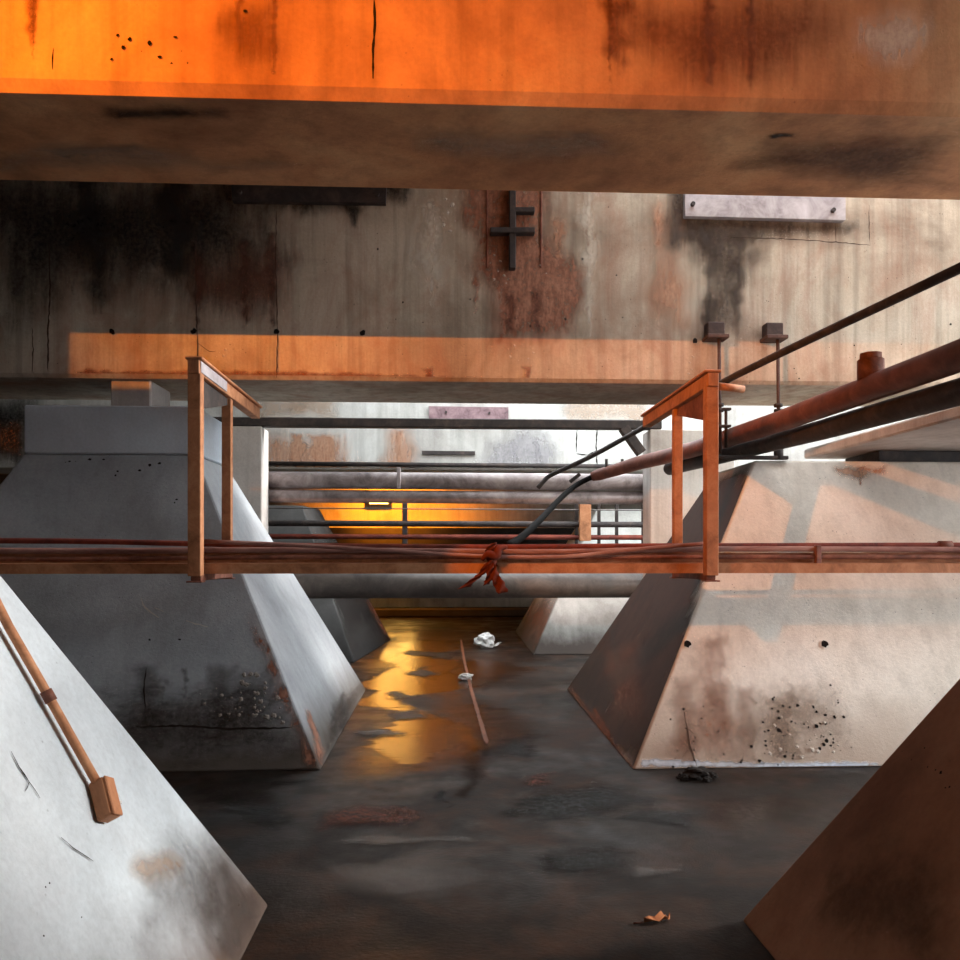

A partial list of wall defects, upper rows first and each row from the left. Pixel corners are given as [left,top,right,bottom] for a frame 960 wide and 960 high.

crack [370,0,378,78]
rust [604,0,629,61]
water stain [159,183,189,275]
rust [463,190,585,340]
water stain [665,194,850,327]
water stain [667,491,703,543]
water stain [719,466,748,543]
rust [836,467,882,484]
water stain [118,673,279,753]
crack [136,672,291,730]
water stain [567,573,876,767]
spalling [750,696,852,766]